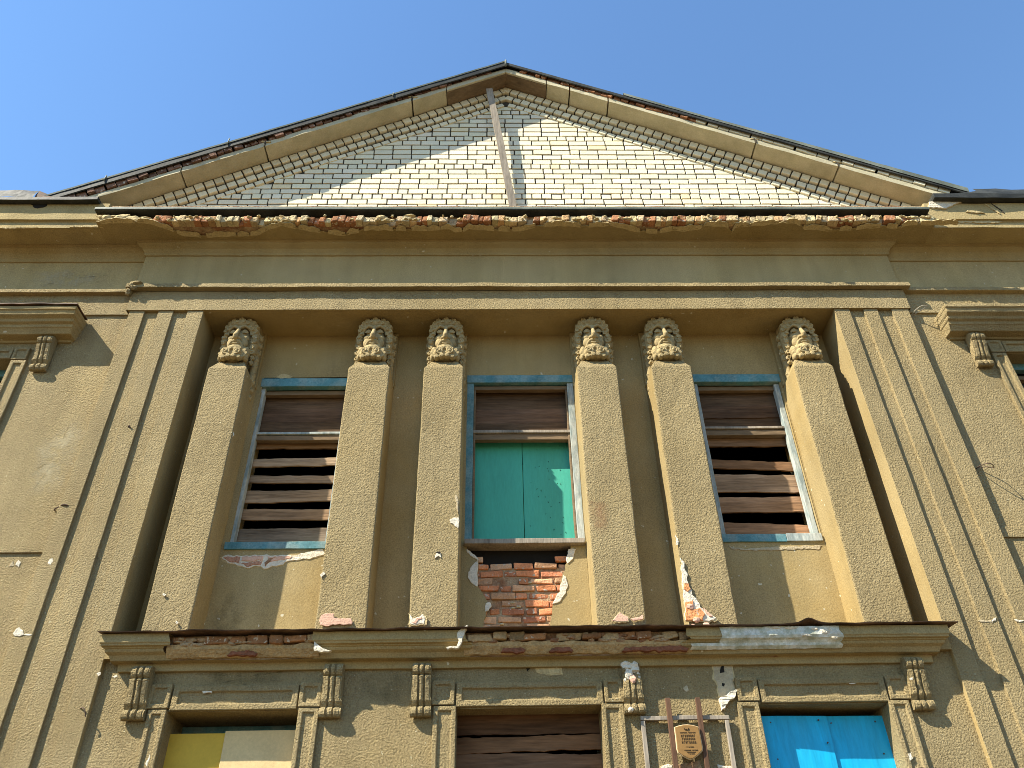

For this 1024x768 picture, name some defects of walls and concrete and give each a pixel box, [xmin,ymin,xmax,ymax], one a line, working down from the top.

spalling [70,201,1004,238]
spalling [220,549,325,570]
spalling [166,613,353,660]
spalling [407,613,427,626]
spalling [446,549,844,683]
spalling [712,666,737,711]